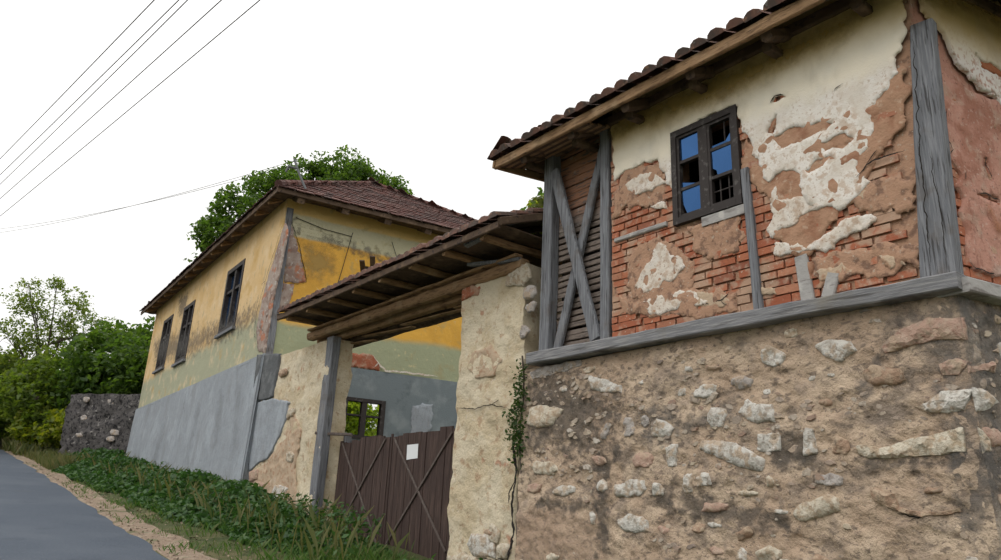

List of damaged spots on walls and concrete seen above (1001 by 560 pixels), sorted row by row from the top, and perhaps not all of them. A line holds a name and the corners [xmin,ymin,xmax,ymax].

flaking render [256,223,306,353]
flaking render [250,413,302,506]
crack [477,437,518,560]